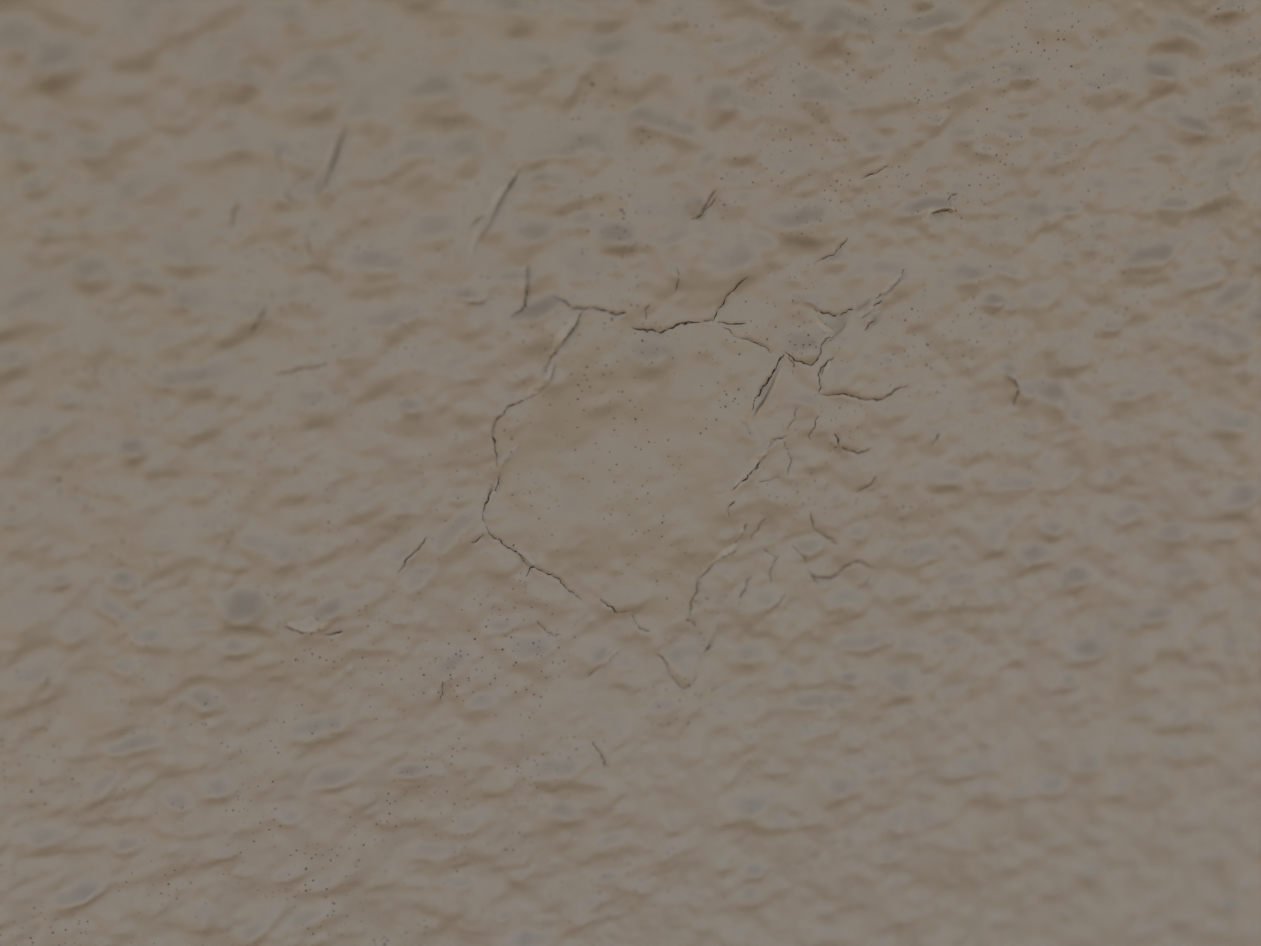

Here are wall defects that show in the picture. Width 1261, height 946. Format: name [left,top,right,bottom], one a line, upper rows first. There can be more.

crack [471,264,908,688]